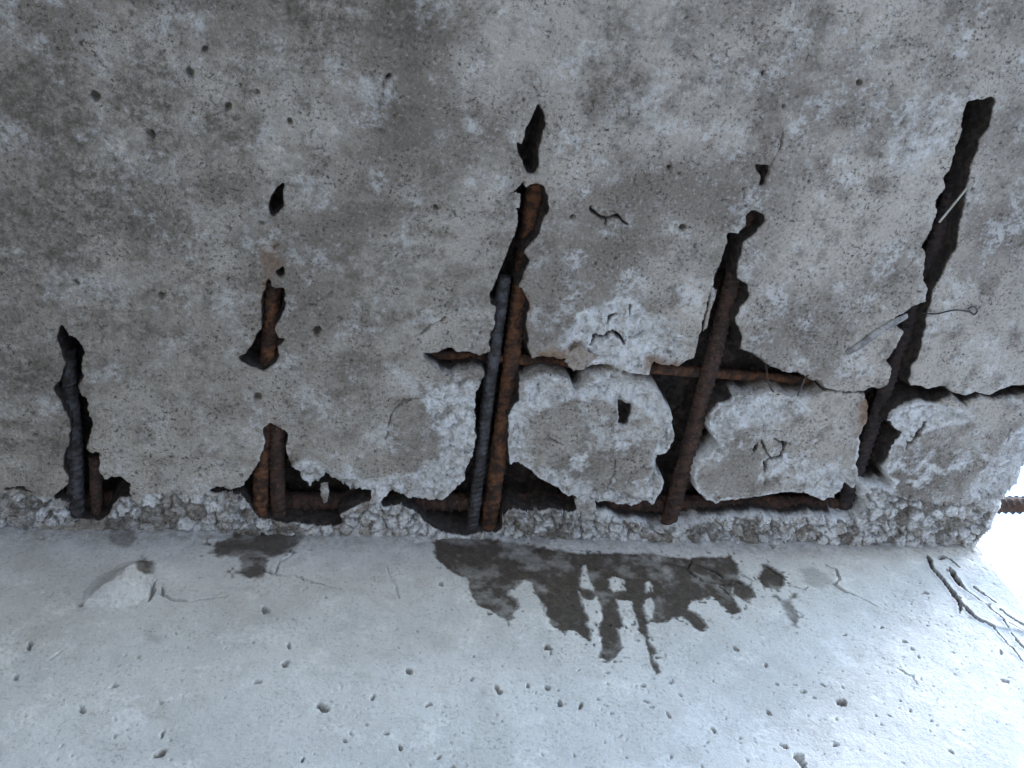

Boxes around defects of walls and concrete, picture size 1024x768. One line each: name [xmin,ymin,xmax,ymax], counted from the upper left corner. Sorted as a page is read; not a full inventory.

spalling [0,97,1024,560]
rust [533,345,566,359]
crack [905,421,928,451]
water stain [197,532,318,587]
water stain [424,535,835,680]
crack [926,554,1024,662]